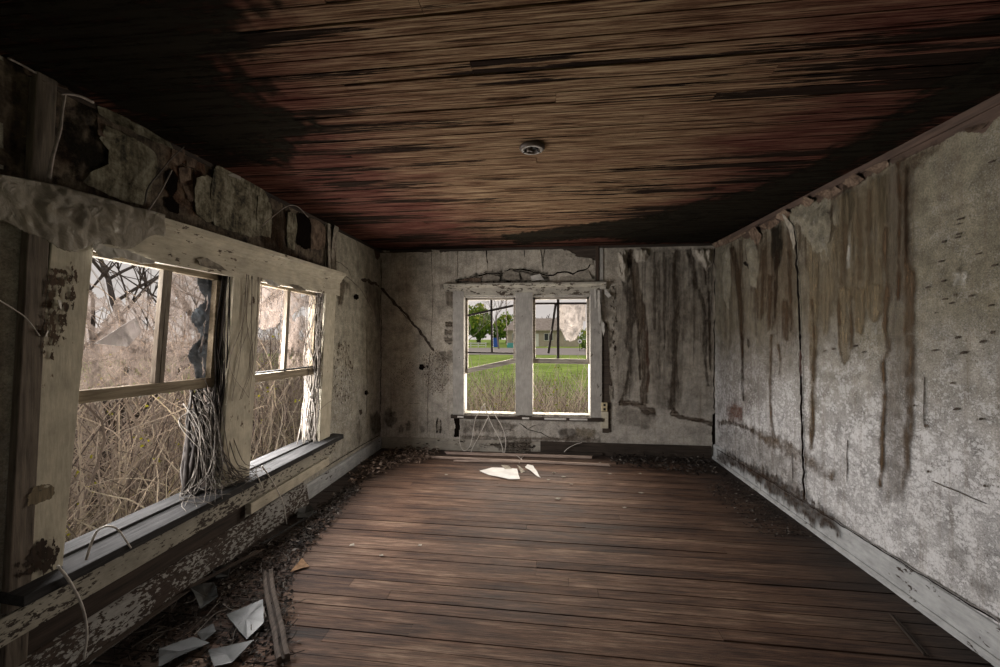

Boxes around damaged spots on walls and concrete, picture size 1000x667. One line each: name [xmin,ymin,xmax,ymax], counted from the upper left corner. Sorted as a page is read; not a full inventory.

spalling [171,148,198,206]
peeling [37,266,79,360]
spalling [311,218,331,269]
crack [326,252,435,467]
leakage [501,51,1000,487]
crack [717,214,1000,623]
peeling [27,484,55,506]
peeling [16,538,60,578]